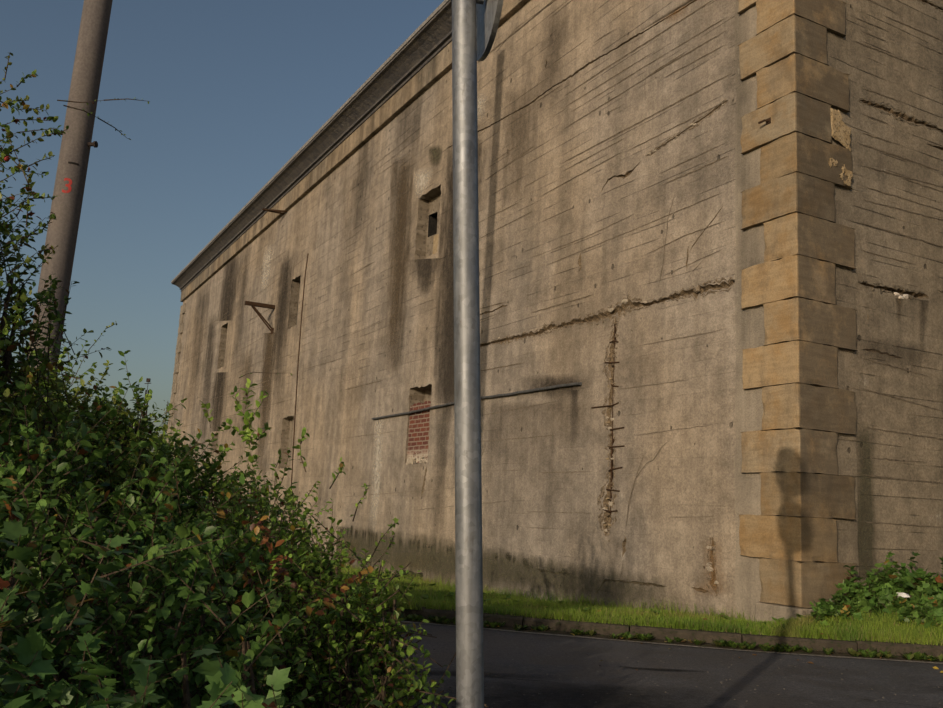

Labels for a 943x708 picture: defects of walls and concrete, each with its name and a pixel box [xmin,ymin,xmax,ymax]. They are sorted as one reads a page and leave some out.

spalling [830,108,851,151]
crack [602,162,640,190]
spalling [828,158,853,187]
damp [389,158,454,413]
crack [480,191,735,349]
crack [858,280,943,301]
damp [336,526,455,582]
damp [482,553,646,604]
spalling [692,537,719,597]